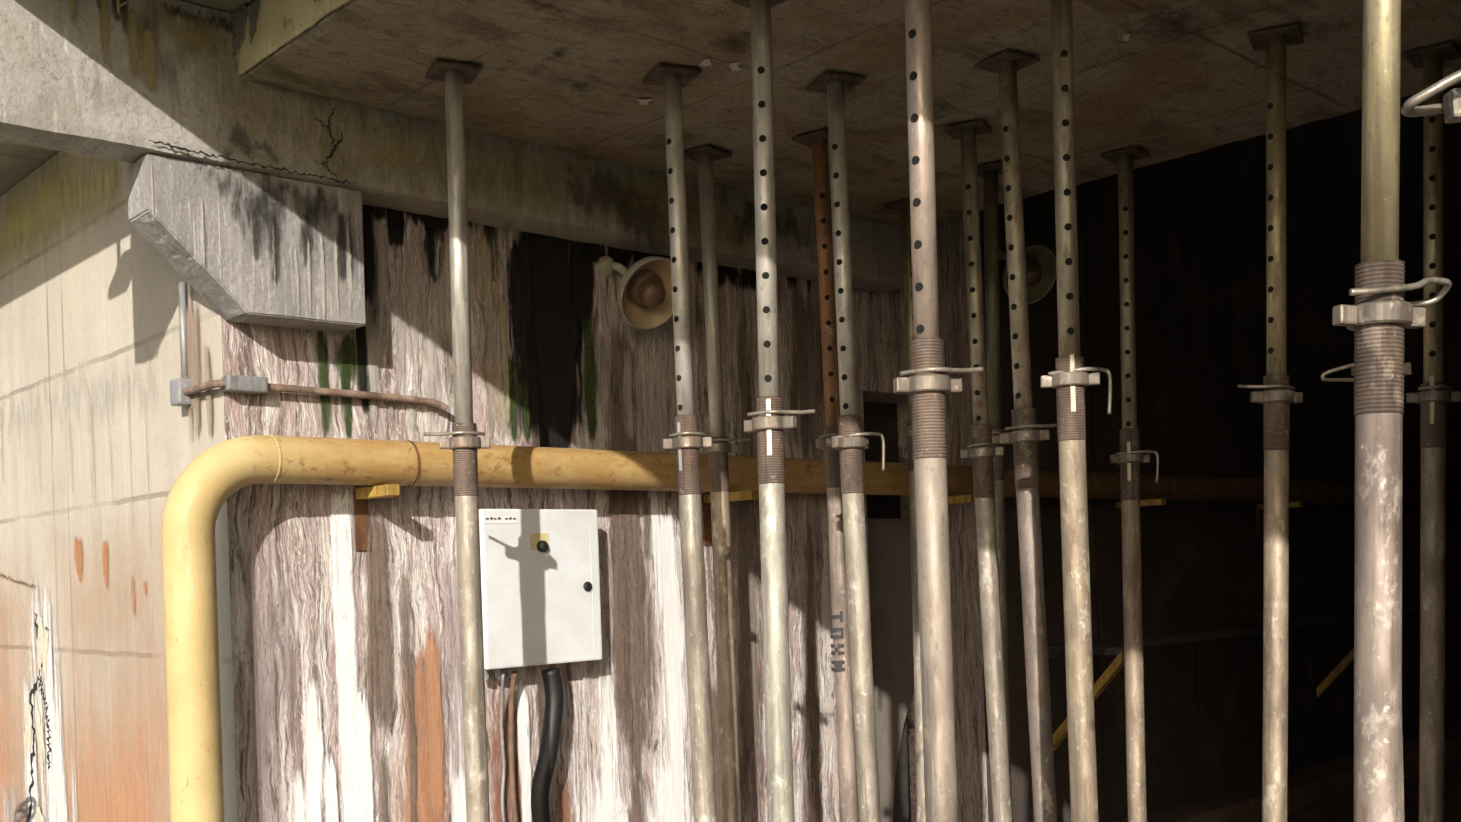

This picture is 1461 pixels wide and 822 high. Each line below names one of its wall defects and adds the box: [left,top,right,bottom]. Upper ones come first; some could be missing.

leakage [97,0,233,89]
crack [149,108,357,184]
leakage [736,202,755,242]
leakage [236,178,449,440]
leakage [467,169,670,453]
corrosion [74,537,82,581]
crack [0,573,52,822]